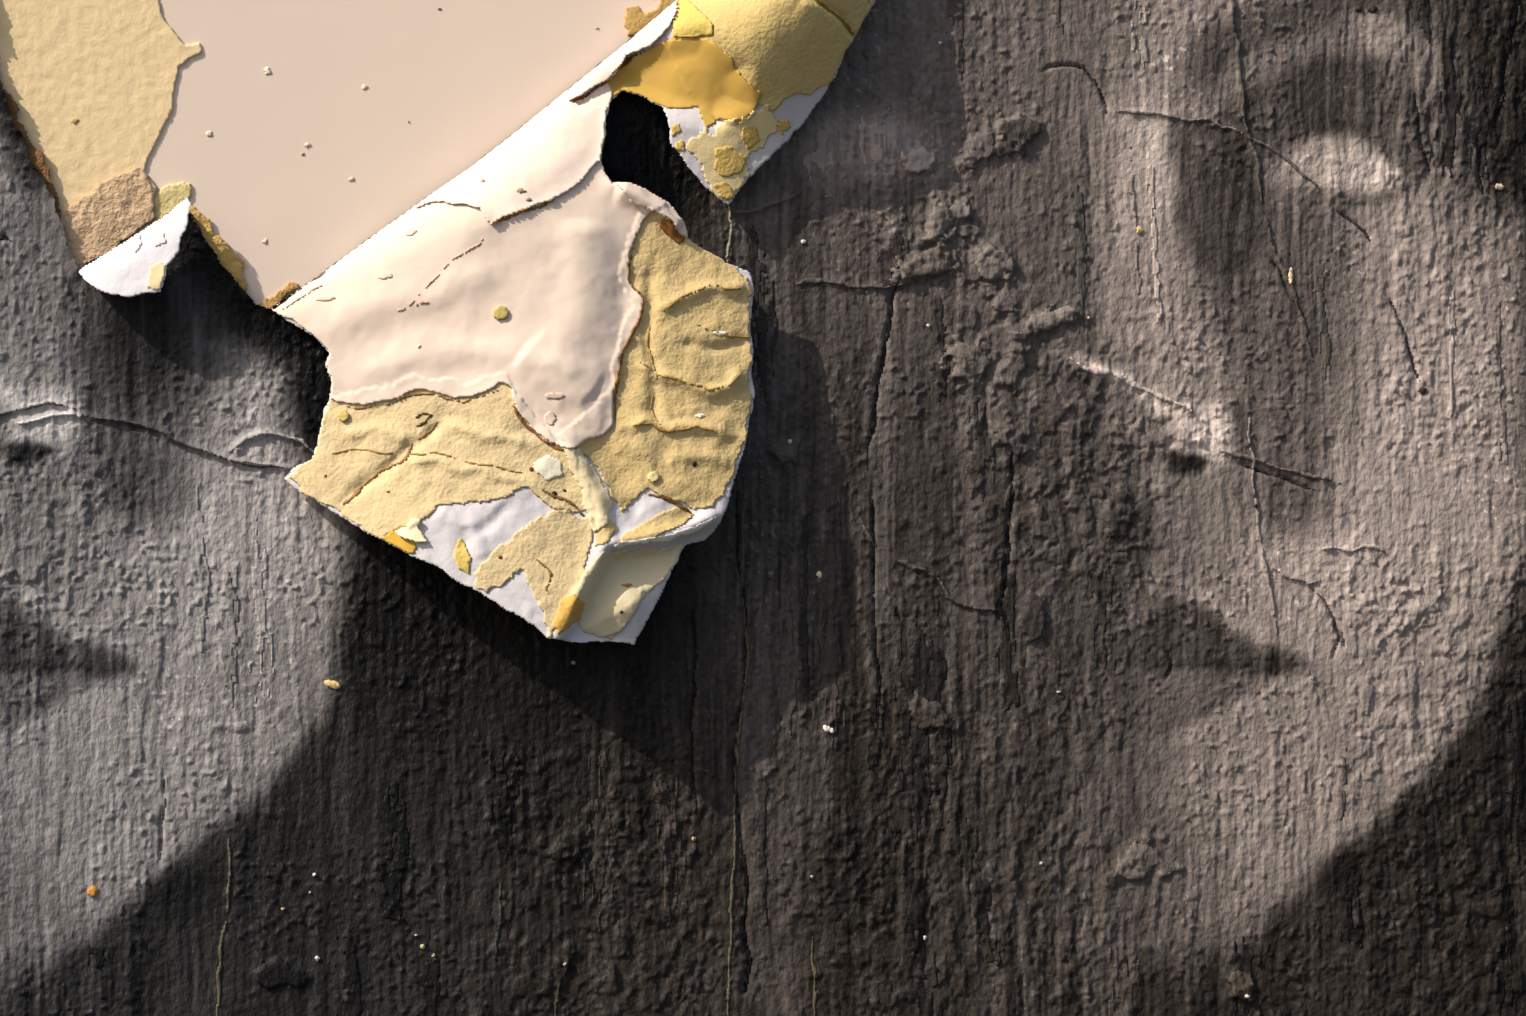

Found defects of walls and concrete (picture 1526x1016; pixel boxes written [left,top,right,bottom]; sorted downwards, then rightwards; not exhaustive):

peeling [144,0,675,309]